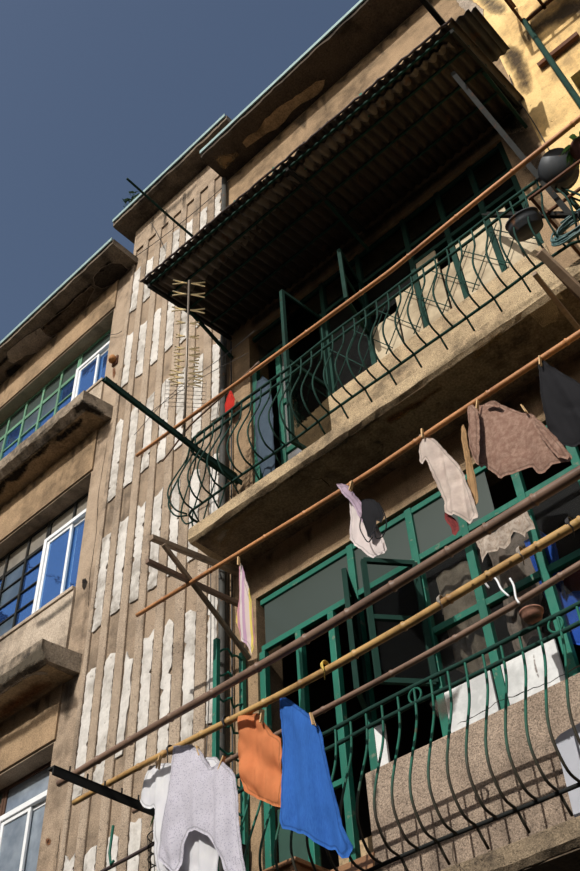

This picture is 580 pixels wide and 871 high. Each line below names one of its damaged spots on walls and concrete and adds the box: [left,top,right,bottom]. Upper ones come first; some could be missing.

water stain [482,0,504,13]
water stain [523,0,580,42]
peeling [242,79,325,148]